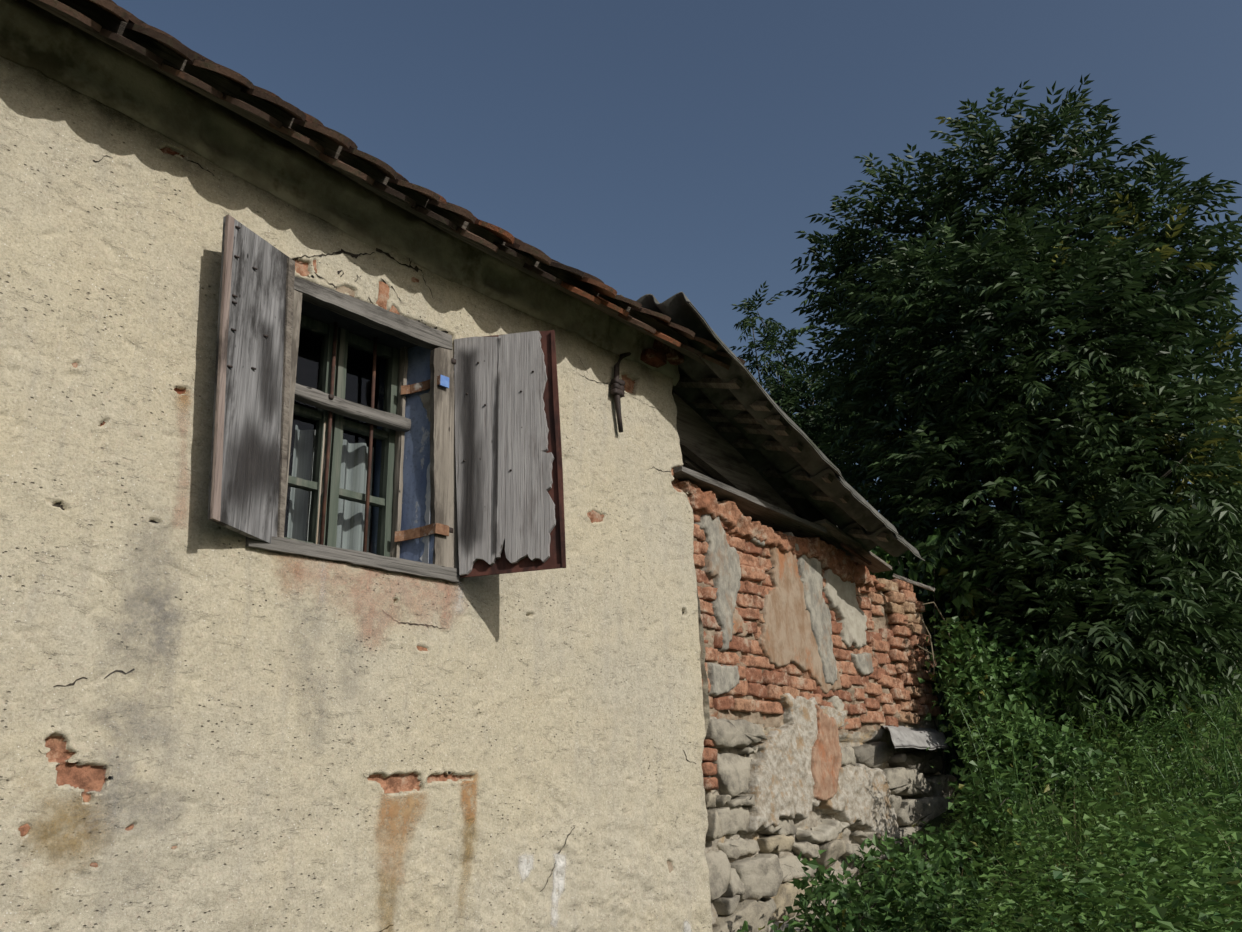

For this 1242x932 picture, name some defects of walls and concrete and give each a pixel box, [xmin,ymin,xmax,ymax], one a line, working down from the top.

crack [292,248,448,333]
spalling [374,281,400,315]
crack [53,669,135,687]
spalling [39,735,114,802]
spalling [18,824,31,837]
corrosion [381,795,420,845]
corrosion [462,774,477,859]